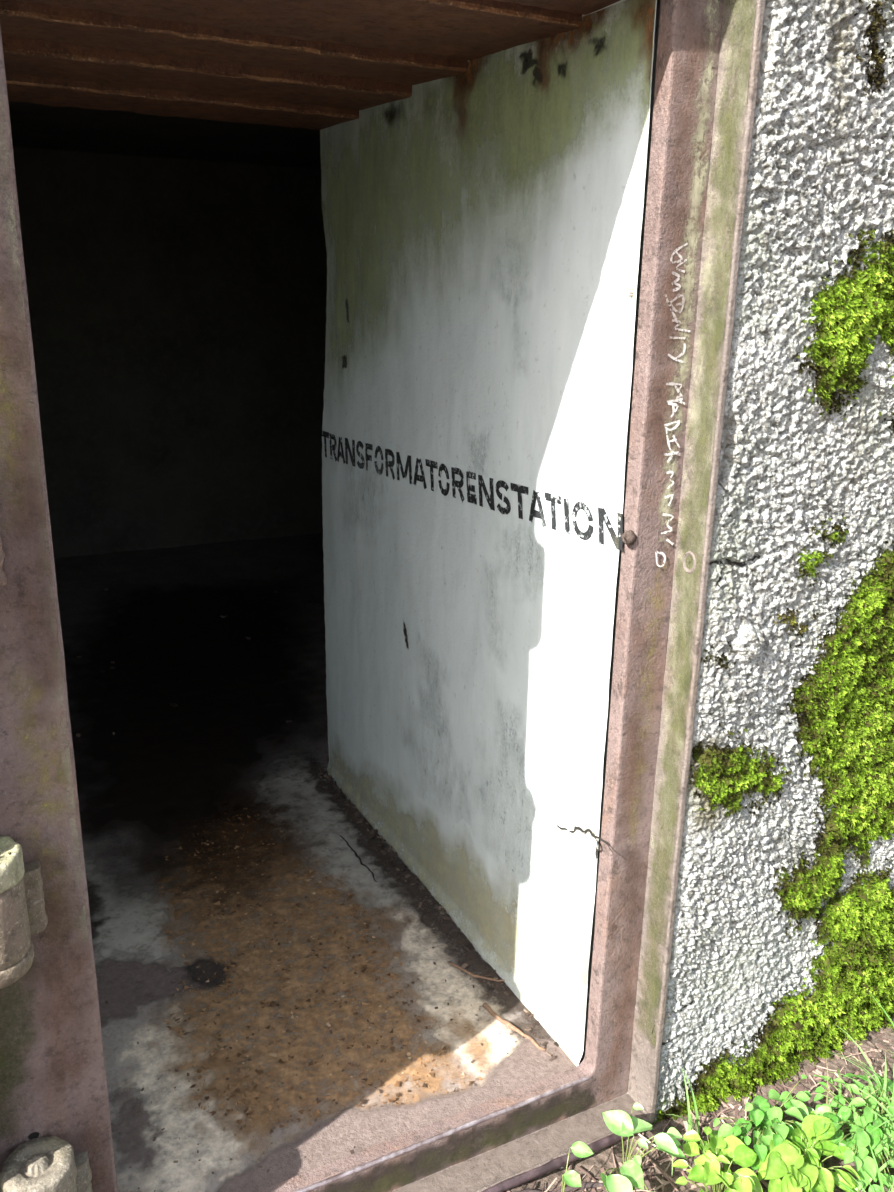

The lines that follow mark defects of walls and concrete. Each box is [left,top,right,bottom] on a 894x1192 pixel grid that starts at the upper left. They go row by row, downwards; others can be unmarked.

corrosion [537,8,605,88]
crack [710,555,760,587]
damp [64,581,592,1192]
flaking render [562,828,597,865]